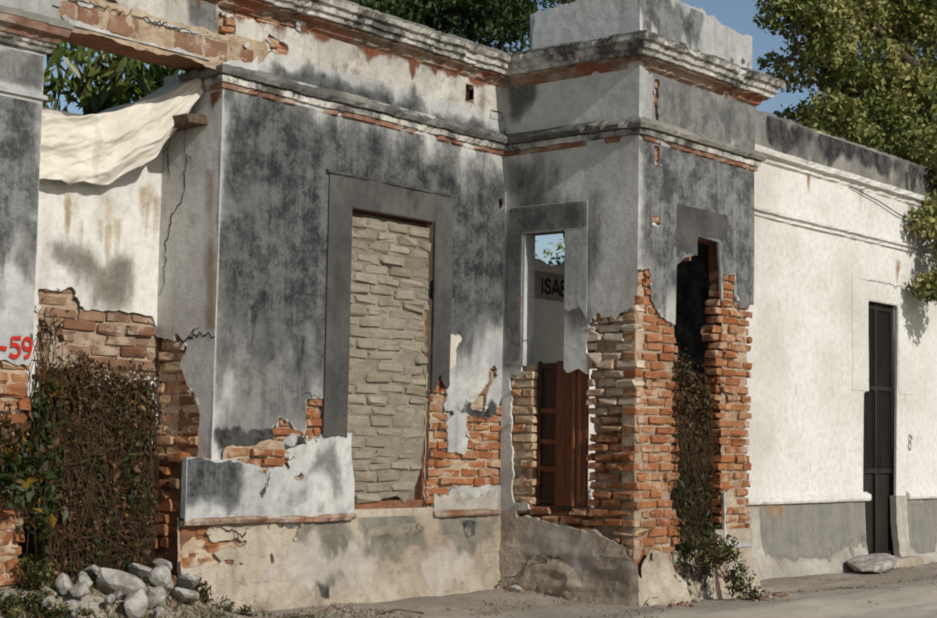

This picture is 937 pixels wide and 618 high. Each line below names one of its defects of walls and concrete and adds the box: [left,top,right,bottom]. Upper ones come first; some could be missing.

crack [73,0,239,44]
flaking render [53,0,301,69]
flaking render [0,466,27,589]
water stain [0,95,39,275]
flaking render [0,287,200,456]
crack [158,130,194,296]
crack [181,327,217,342]
water stain [187,457,243,509]
flaking render [223,398,333,480]
water stain [215,85,597,450]
flaking render [423,269,681,578]
water stain [641,140,755,393]